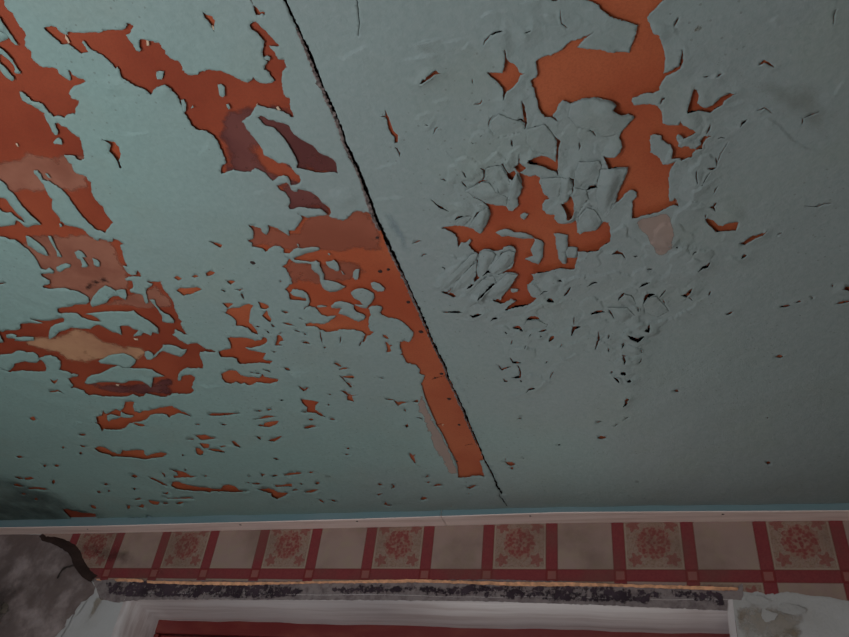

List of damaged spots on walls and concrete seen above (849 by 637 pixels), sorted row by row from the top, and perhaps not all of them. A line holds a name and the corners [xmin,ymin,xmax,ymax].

peeling [0,0,85,165]
peeling [44,1,294,174]
peeling [0,177,492,494]
peeling [249,145,330,192]
peeling [381,111,400,157]
crack [284,0,507,506]
peeling [438,0,710,310]
peeling [687,89,734,112]
peeling [705,203,738,232]